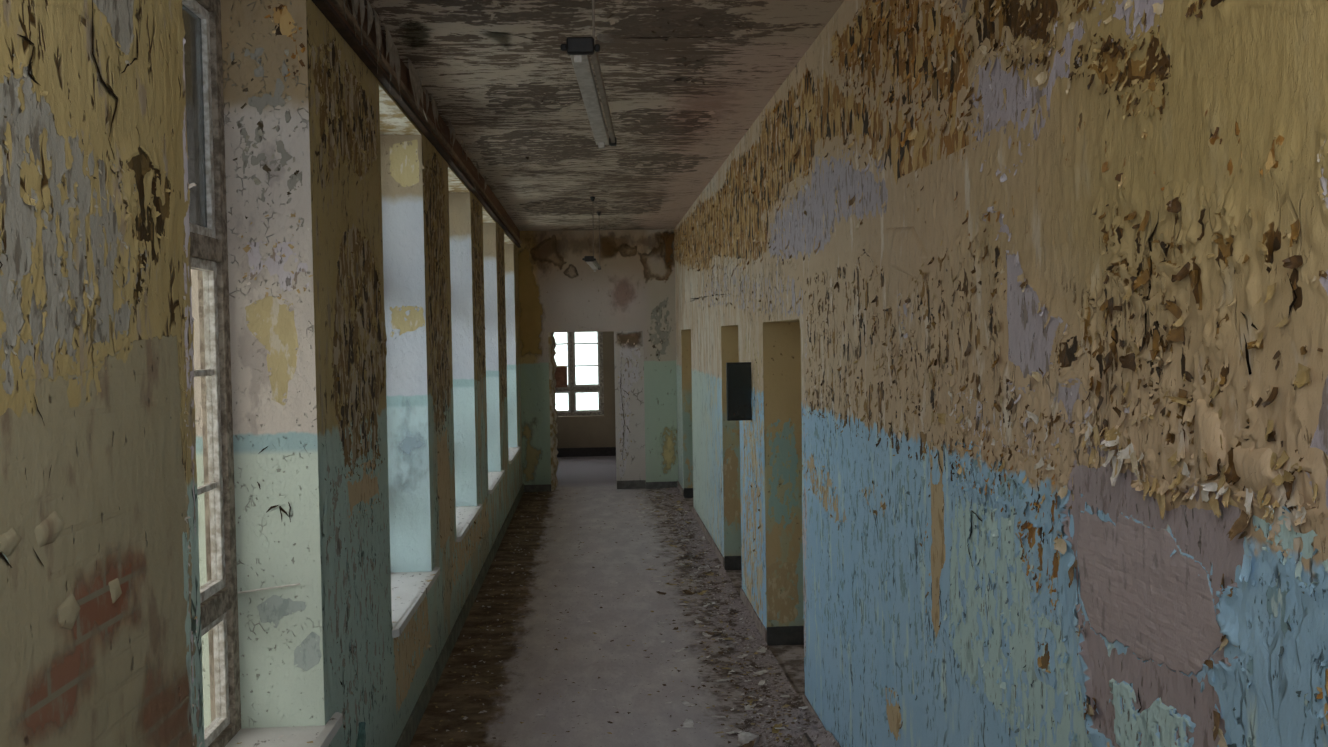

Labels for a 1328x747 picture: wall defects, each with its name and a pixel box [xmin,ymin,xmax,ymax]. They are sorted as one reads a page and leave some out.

flaking render [0,18,205,747]
peeling [222,0,491,747]
peeling [470,191,507,410]
peeling [458,78,735,167]
peeling [412,0,783,43]
peeling [510,0,1328,747]